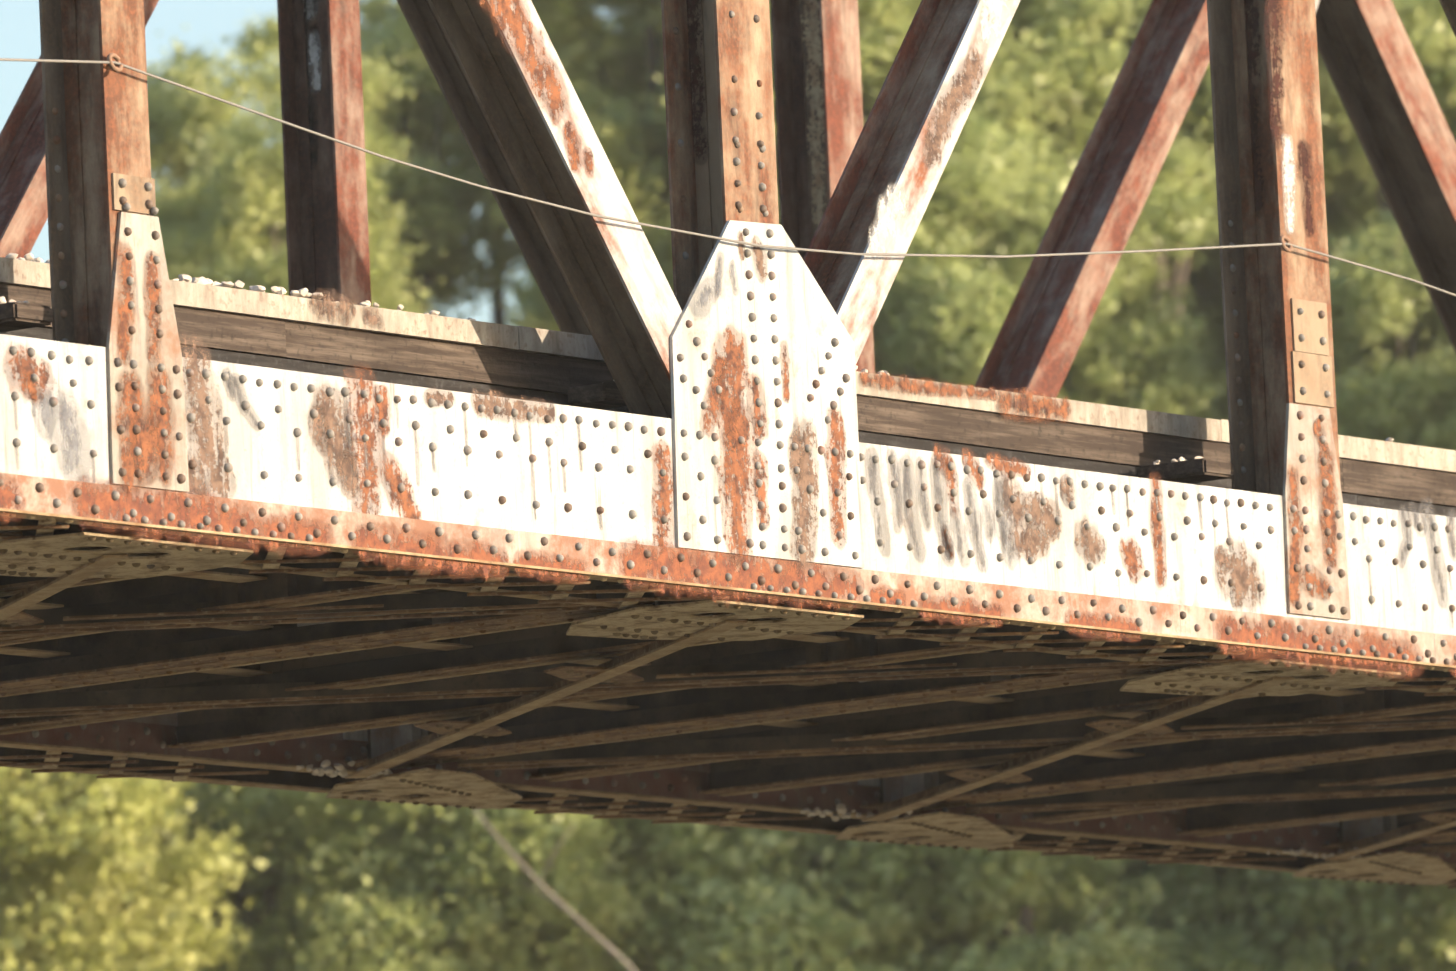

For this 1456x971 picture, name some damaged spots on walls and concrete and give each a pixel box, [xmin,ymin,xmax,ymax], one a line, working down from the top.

corrosion [480,0,593,176]
corrosion [4,348,52,405]
corrosion [72,242,330,553]
corrosion [308,371,586,581]
corrosion [621,327,1003,627]
corrosion [933,444,1032,557]
water stain [868,451,1107,567]
corrosion [1065,613,1140,641]
corrosion [1120,477,1167,586]
corrosion [1288,418,1339,604]
corrosion [1215,541,1424,678]
water stain [1401,500,1456,622]